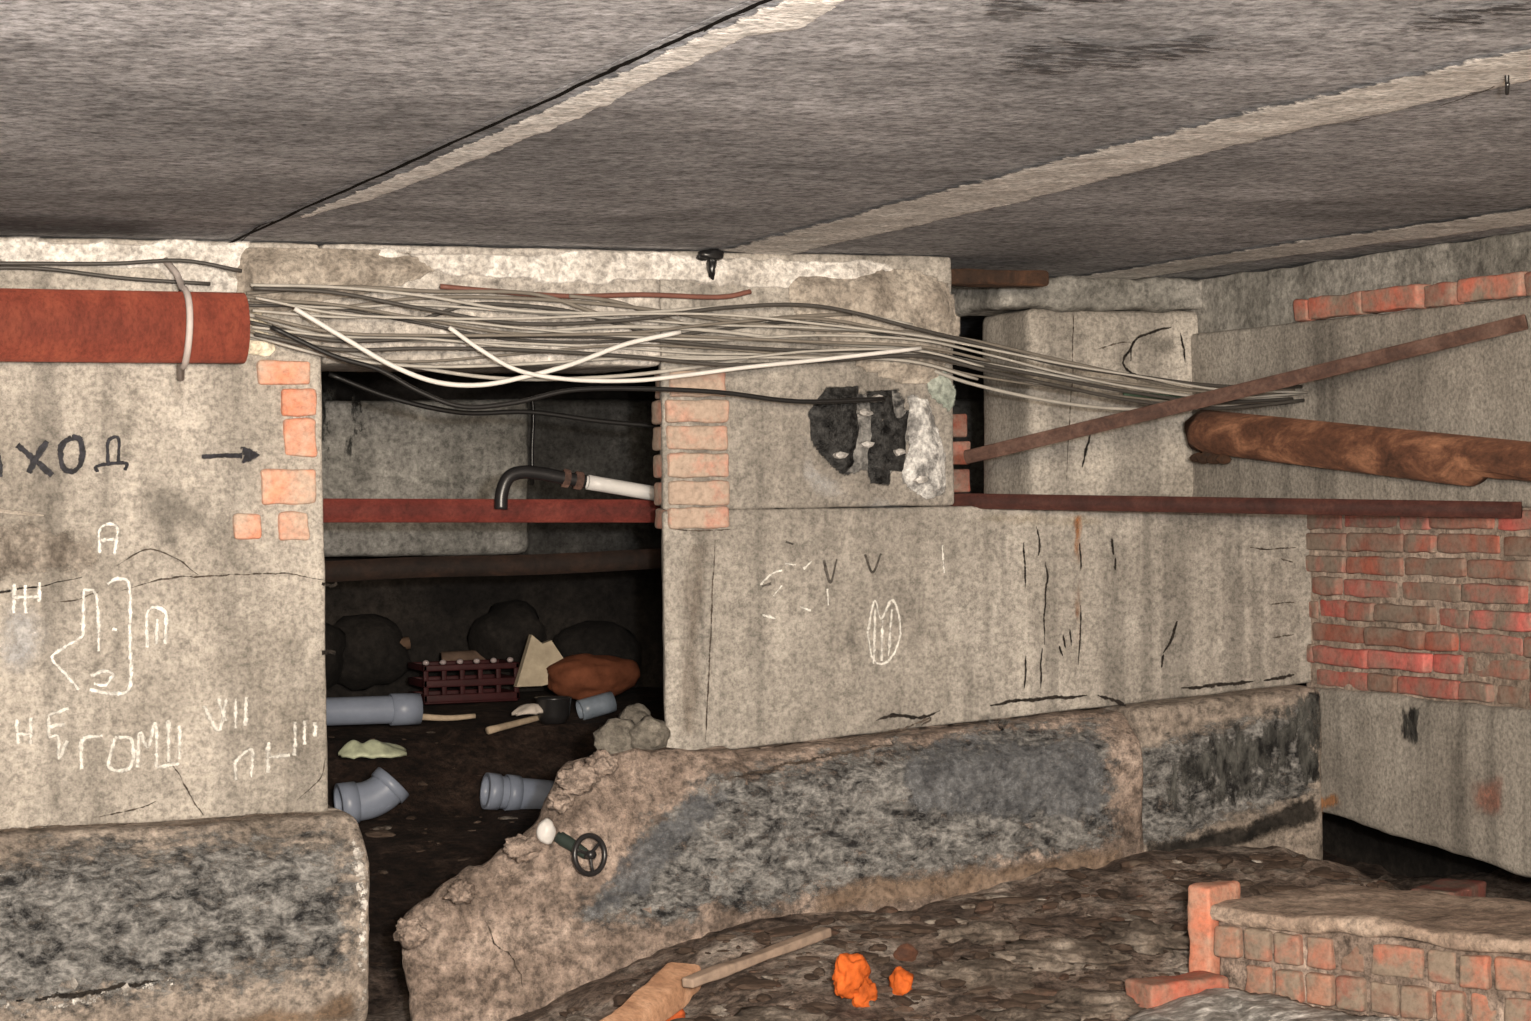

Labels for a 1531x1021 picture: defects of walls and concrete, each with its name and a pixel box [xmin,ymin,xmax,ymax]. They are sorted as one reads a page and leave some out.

crack [228,0,773,243]
flaking render [292,0,844,221]
rust [1189,451,1232,464]
crack [0,548,324,602]